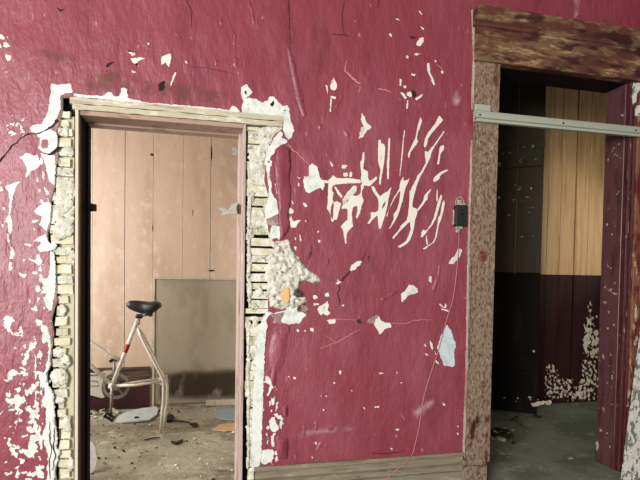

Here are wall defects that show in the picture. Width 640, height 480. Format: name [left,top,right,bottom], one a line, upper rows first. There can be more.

crack [0,119,59,162]
peeling [359,113,371,139]
spalling [0,83,336,480]
crack [322,252,370,348]
flaking render [424,325,456,367]
peeling [528,302,614,407]